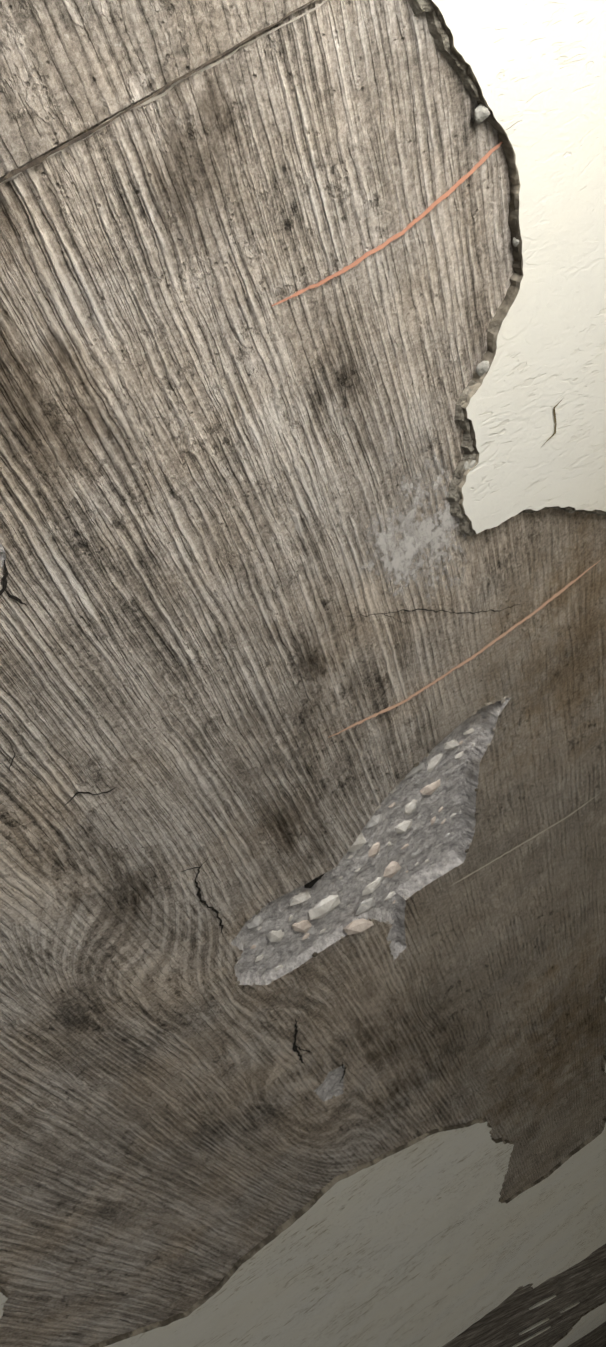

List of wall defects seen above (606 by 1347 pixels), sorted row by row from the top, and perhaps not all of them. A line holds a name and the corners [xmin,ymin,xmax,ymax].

peeling [0,0,317,179]
peeling [408,0,480,101]
peeling [429,0,523,536]
crack [0,560,27,605]
spalling [231,697,511,987]
spalling [314,1066,346,1101]
peeling [498,1115,606,1203]
peeling [90,1117,488,1347]
peeling [442,1244,606,1347]